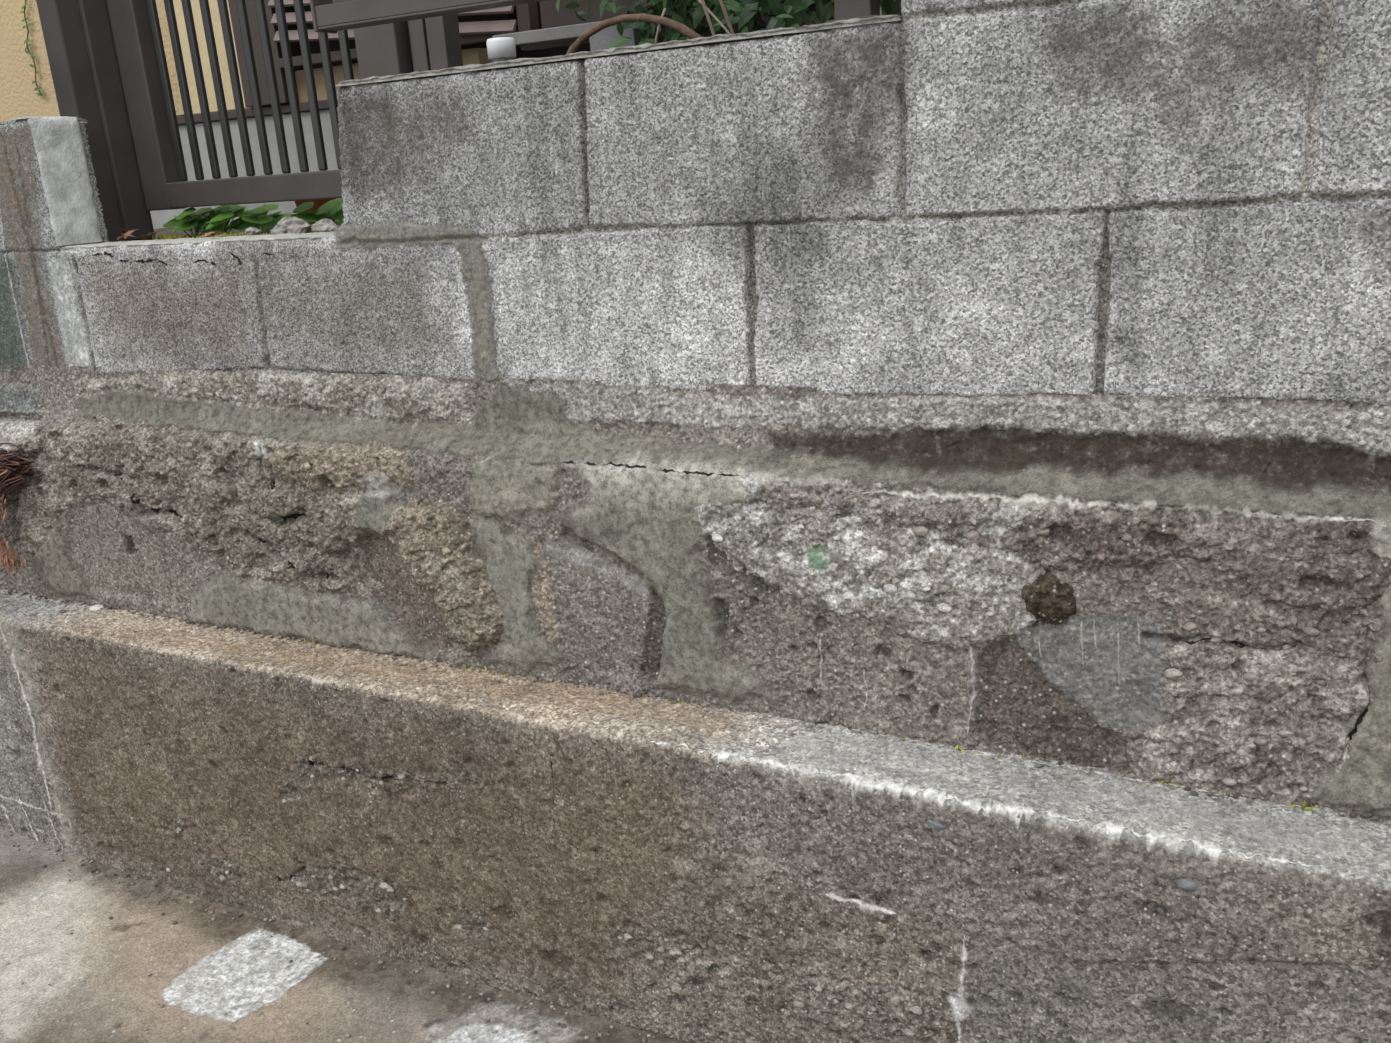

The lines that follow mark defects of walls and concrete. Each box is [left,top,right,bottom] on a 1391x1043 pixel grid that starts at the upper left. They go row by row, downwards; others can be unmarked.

crack [534,460,749,478]